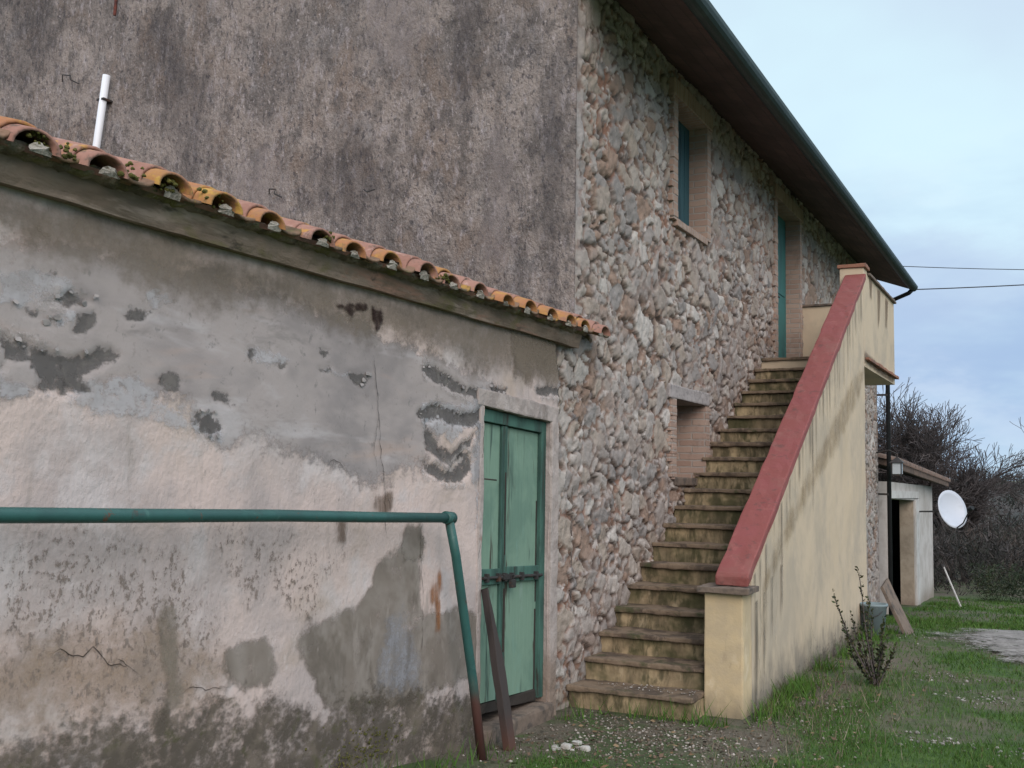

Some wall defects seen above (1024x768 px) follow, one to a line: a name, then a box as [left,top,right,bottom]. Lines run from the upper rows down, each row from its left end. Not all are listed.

peeling [0,238,507,490]
peeling [536,386,559,401]
rust [431,573,441,629]
crack [51,640,137,673]
leakage [0,525,477,768]